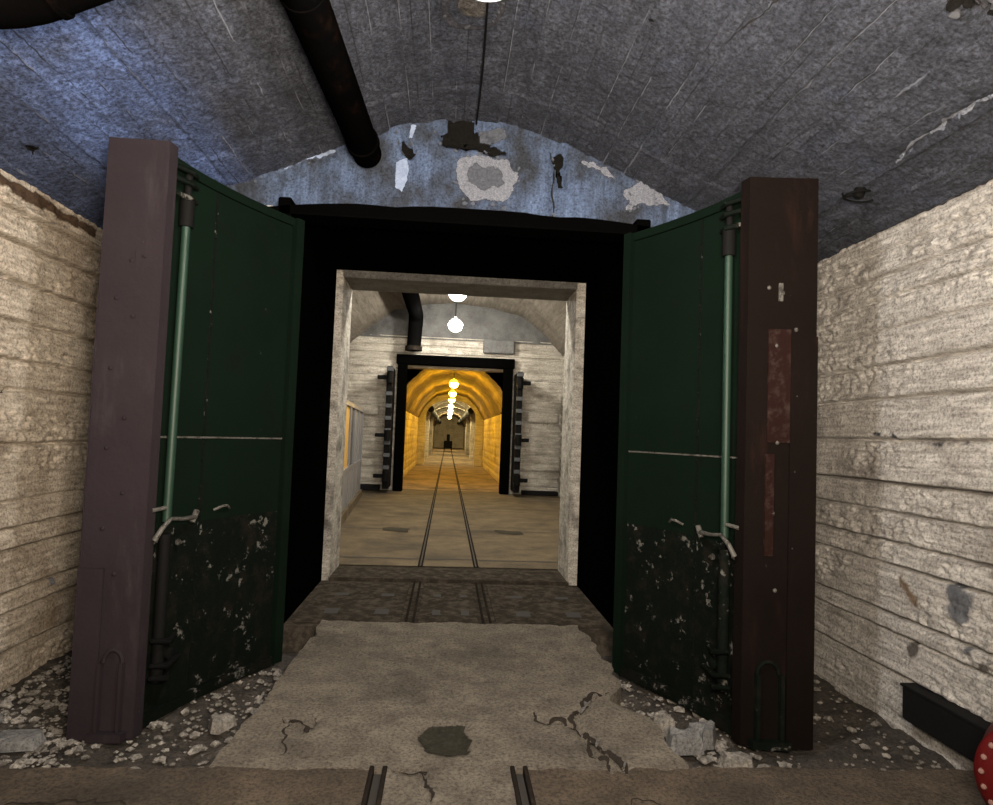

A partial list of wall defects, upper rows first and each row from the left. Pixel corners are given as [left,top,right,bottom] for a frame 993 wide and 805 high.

spalling [946,0,993,19]
spalling [395,131,418,160]
peeling [434,120,520,211]
peeling [581,161,615,178]
peeling [623,180,670,212]
leakage [947,582,972,624]
crack [533,692,628,774]